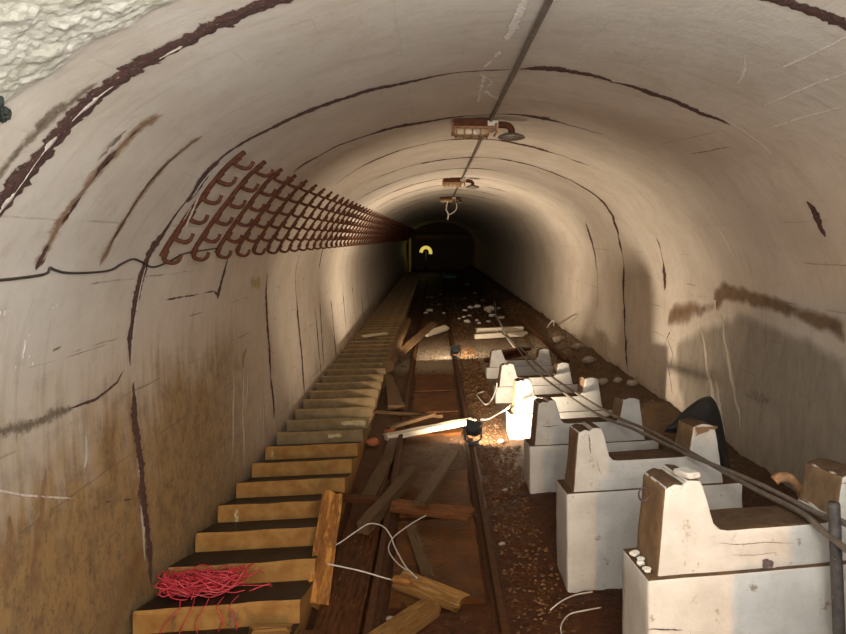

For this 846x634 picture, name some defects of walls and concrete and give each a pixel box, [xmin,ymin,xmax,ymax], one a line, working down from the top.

crack [0,0,294,217]
crack [760,0,846,71]
crack [0,66,846,436]
crack [0,490,71,499]
crack [106,382,153,584]
water stain [665,277,846,491]